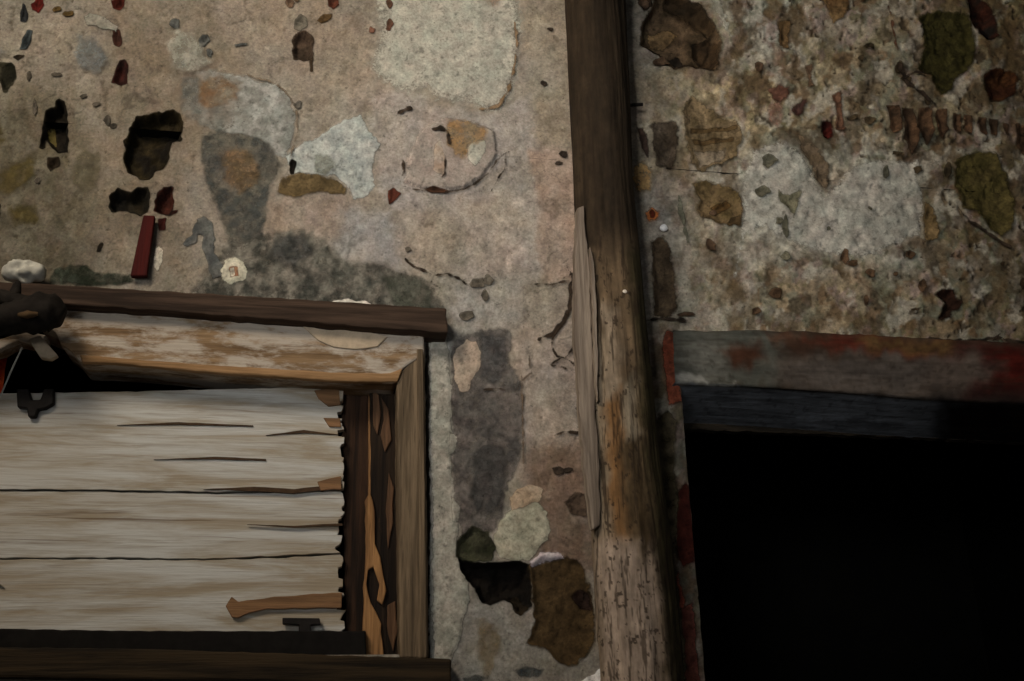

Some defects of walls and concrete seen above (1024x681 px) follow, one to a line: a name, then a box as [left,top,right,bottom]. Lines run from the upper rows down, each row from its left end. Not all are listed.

spalling [0,0,74,92]
spalling [111,0,125,10]
spalling [198,35,212,57]
spalling [33,98,69,183]
peeling [108,59,346,231]
crack [398,106,412,114]
crack [401,125,507,193]
water stain [192,131,444,308]
crack [483,267,574,463]
water stain [451,329,523,534]
peeling [429,333,595,666]